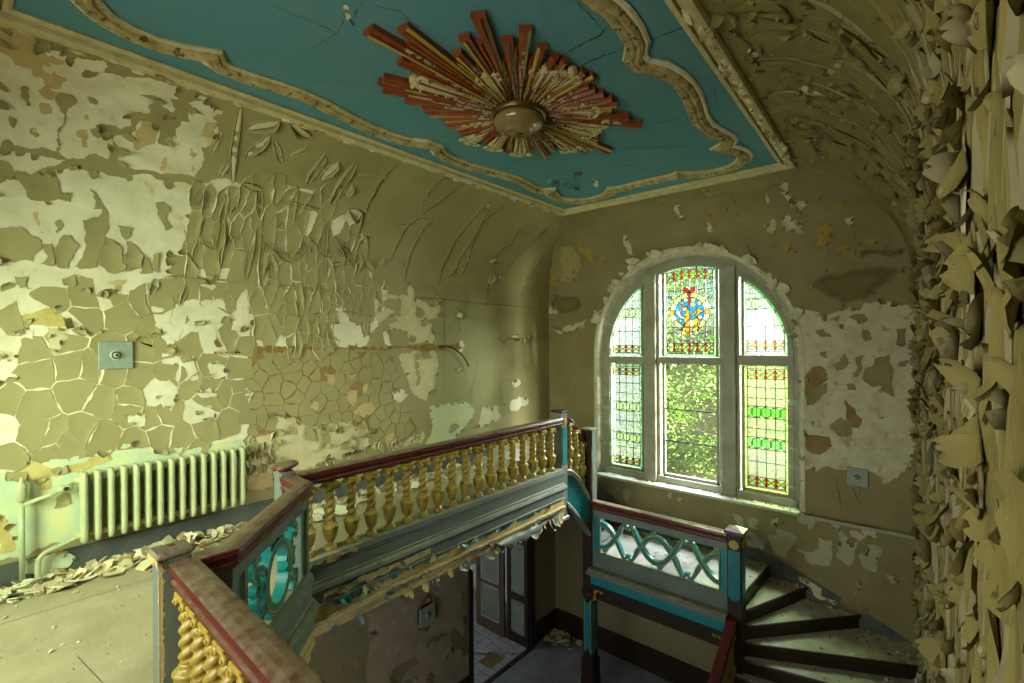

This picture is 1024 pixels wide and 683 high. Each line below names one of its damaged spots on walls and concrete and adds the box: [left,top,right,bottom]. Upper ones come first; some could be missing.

crack [565,5,621,66]
peeling [681,0,828,165]
peeling [0,24,529,576]
crack [357,161,402,239]
crack [387,182,560,407]
peeling [549,235,663,334]
peeling [693,208,757,266]
peeling [733,0,1024,683]
peeling [324,505,564,683]